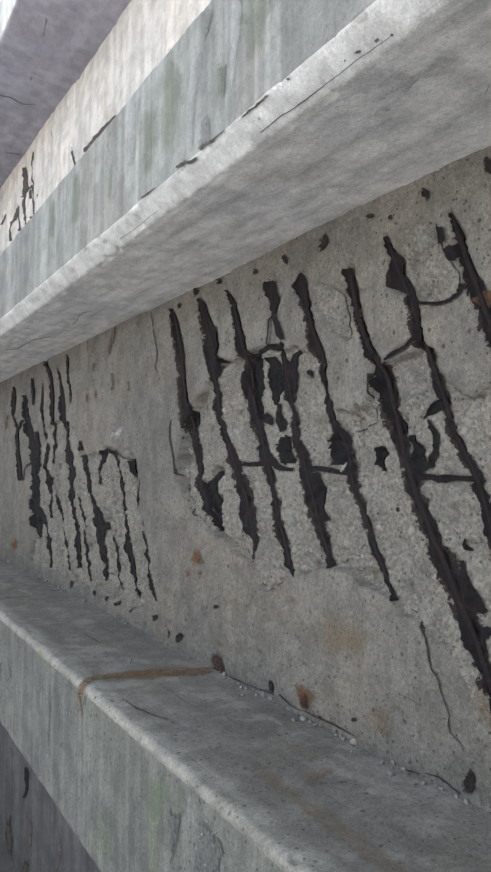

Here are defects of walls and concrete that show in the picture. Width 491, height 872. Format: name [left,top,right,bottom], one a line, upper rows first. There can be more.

crack [260,35,392,133]
spalling [71,115,116,165]
spalling [1,152,38,241]
spalling [402,223,460,306]
spalling [311,282,353,340]
corrosion [341,212,491,714]
spalling [29,421,151,612]
spalling [183,346,491,730]
corrosion [77,654,225,716]
crack [411,609,464,751]
crack [406,770,461,794]
spalling [462,770,475,795]